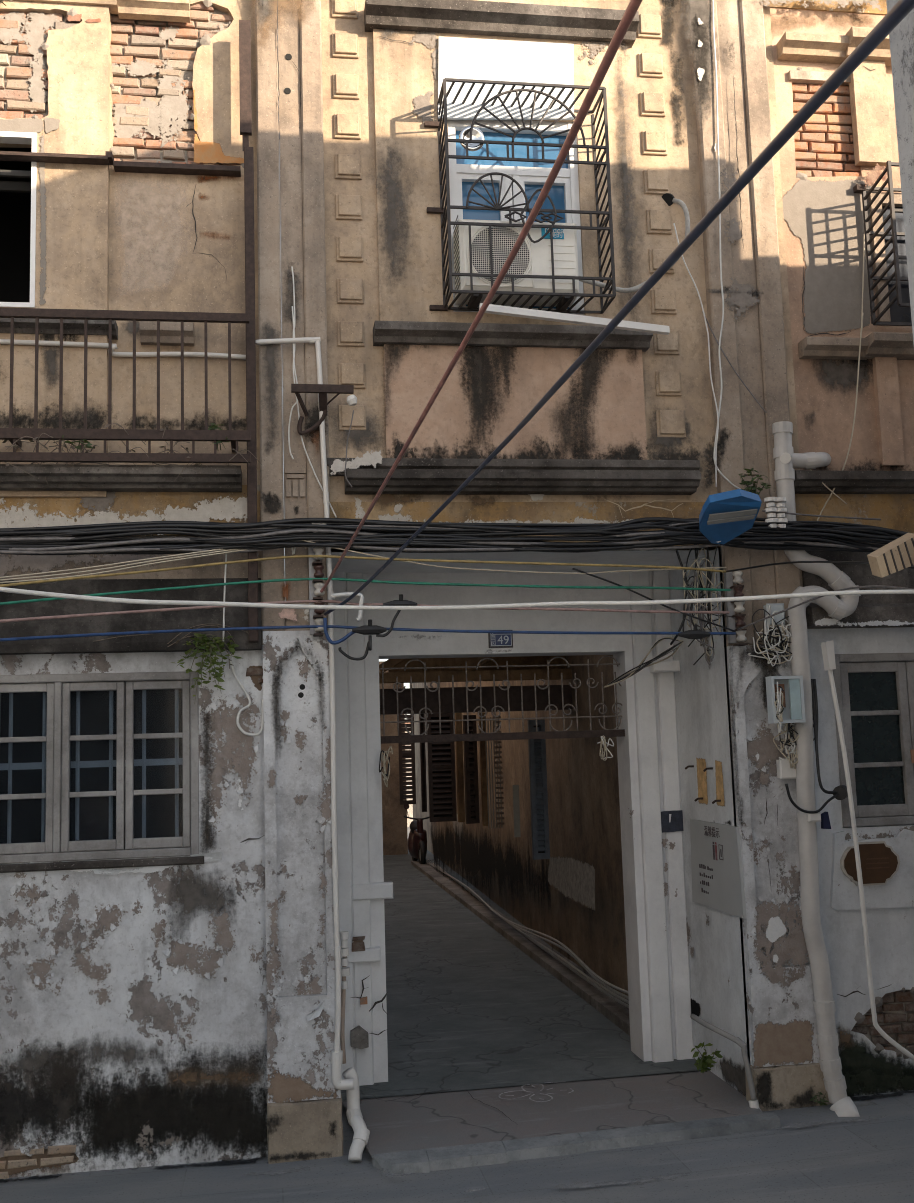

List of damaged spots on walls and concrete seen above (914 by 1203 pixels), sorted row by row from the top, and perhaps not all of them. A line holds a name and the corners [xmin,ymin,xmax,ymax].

spalling [0,0,244,168]
water stain [661,0,715,145]
water stain [377,146,408,277]
water stain [0,406,106,429]
water stain [40,334,78,384]
water stain [392,346,729,488]
peeling [0,494,247,536]
peeling [201,666,277,833]
peeling [149,890,326,1025]
peeling [751,894,809,988]
spalling [851,987,914,1059]
water stain [0,1038,338,1182]